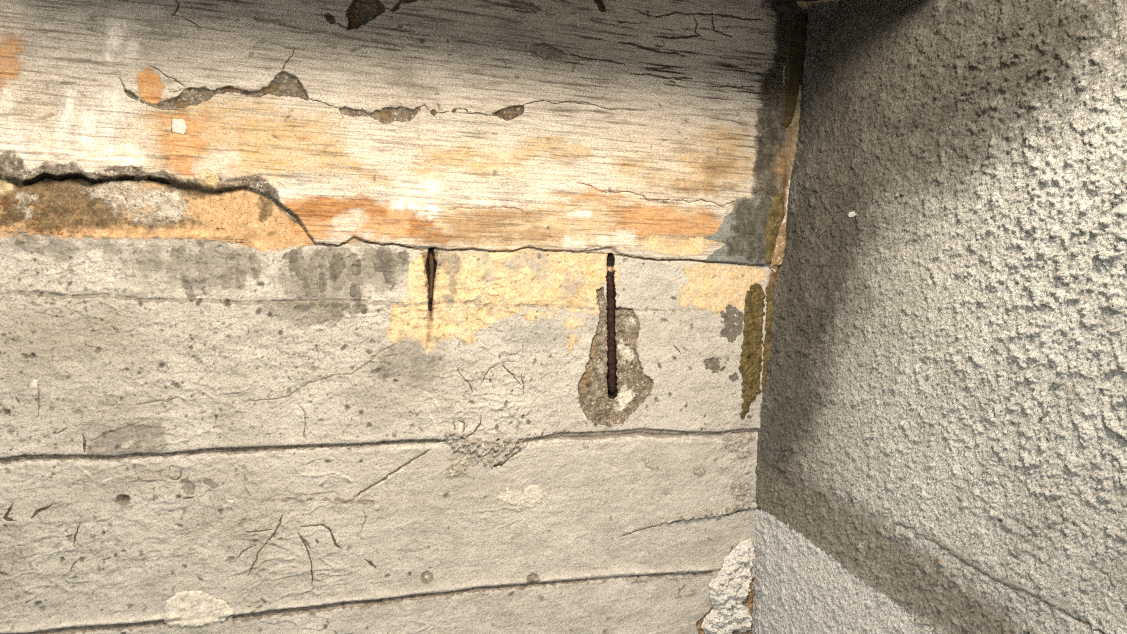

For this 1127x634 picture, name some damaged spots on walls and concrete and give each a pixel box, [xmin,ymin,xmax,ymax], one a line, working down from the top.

water stain [0,0,148,169]
crack [119,0,614,134]
crack [529,9,766,88]
water stain [191,146,241,188]
water stain [390,175,441,219]
corrosion [283,128,792,353]
water stain [752,0,1127,501]
crack [456,360,524,395]
spalling [577,253,654,427]
crack [234,420,481,581]
spalling [696,607,714,634]
spalling [732,578,754,634]